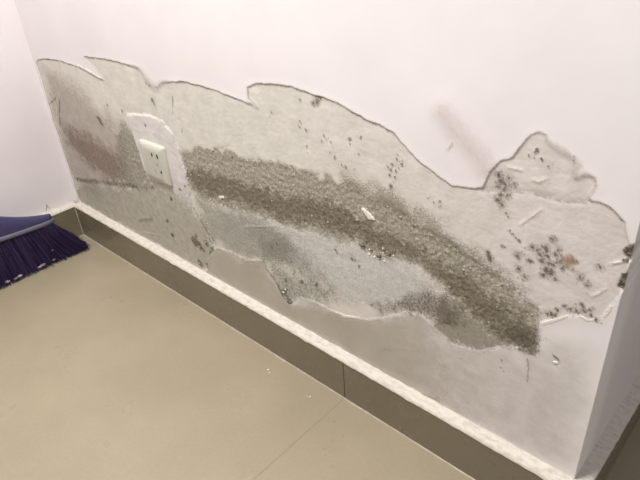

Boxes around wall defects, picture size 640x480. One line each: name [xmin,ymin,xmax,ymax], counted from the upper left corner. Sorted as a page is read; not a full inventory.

damp [63,126,509,391]
peeling [37,56,634,355]
damp [329,152,568,294]